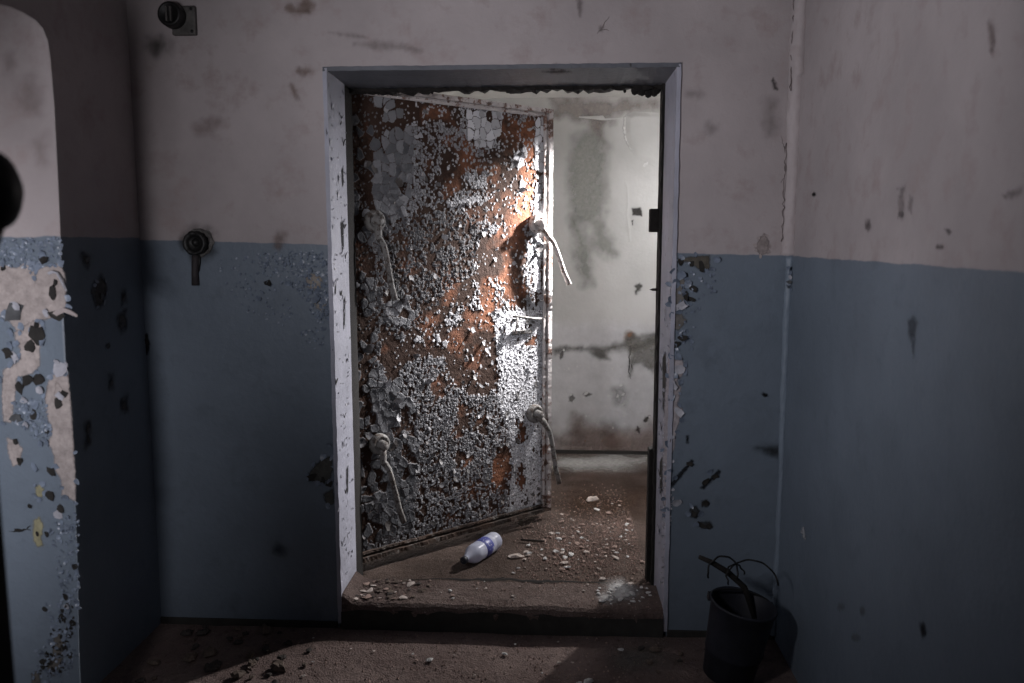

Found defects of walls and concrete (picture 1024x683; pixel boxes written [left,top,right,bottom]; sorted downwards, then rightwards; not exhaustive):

peeling [330,92,351,339]
peeling [455,221,488,276]
peeling [474,110,541,181]
peeling [532,235,544,272]
water stain [553,98,656,279]
peeling [0,236,91,683]
peeling [305,355,407,557]
peeling [419,408,538,518]
peeling [453,289,544,427]
peeling [582,252,721,604]